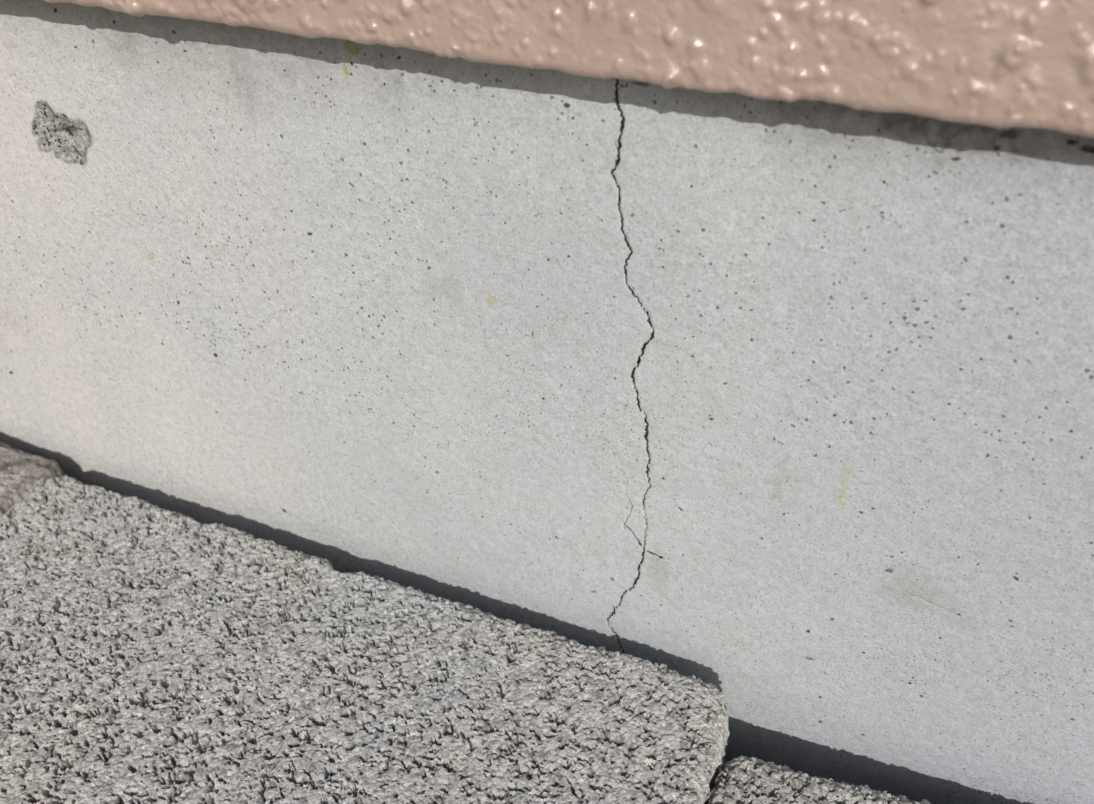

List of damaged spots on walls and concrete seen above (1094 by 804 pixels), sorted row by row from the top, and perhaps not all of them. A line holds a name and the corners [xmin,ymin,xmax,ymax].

spalling [32,101,91,165]
crack [607,79,663,653]